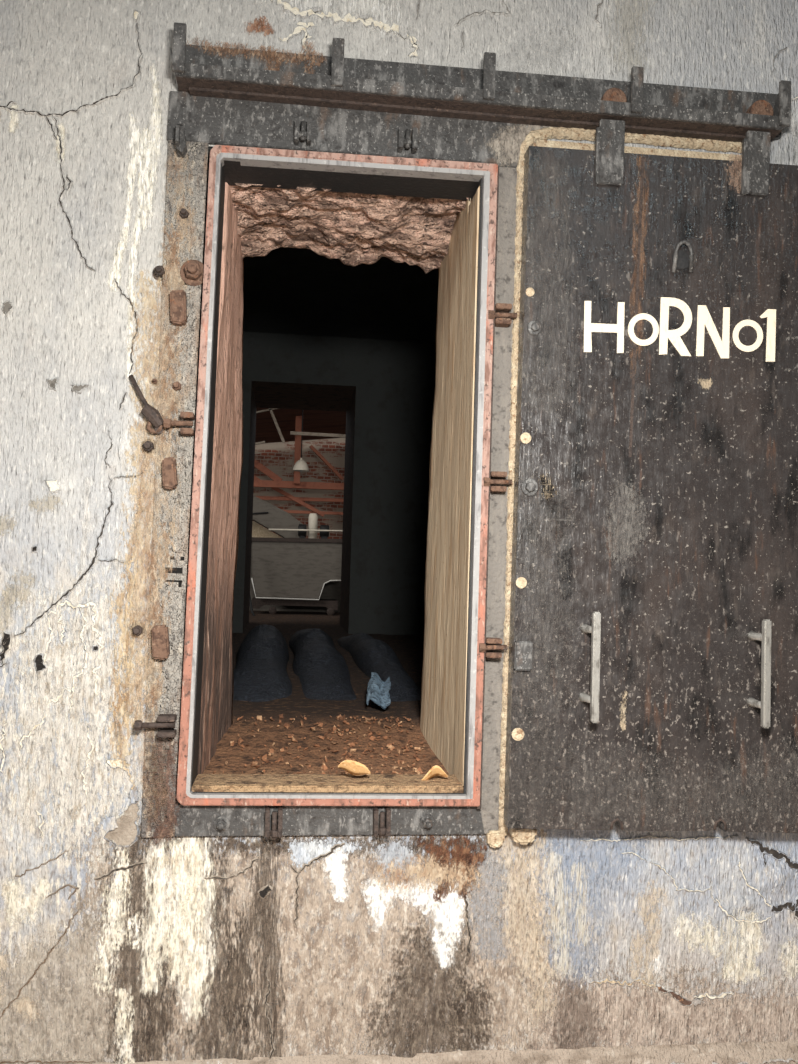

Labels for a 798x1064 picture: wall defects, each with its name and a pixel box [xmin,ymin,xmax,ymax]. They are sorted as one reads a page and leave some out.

rust [186,16,325,74]
crack [414,0,422,19]
crack [454,0,511,47]
crack [593,0,603,28]
crack [0,23,145,668]
damp [0,477,798,1064]
crack [15,847,71,877]
crack [204,856,260,880]
rust [376,835,487,902]
crack [580,834,798,923]
crack [0,861,147,1019]
crack [0,1056,96,1064]